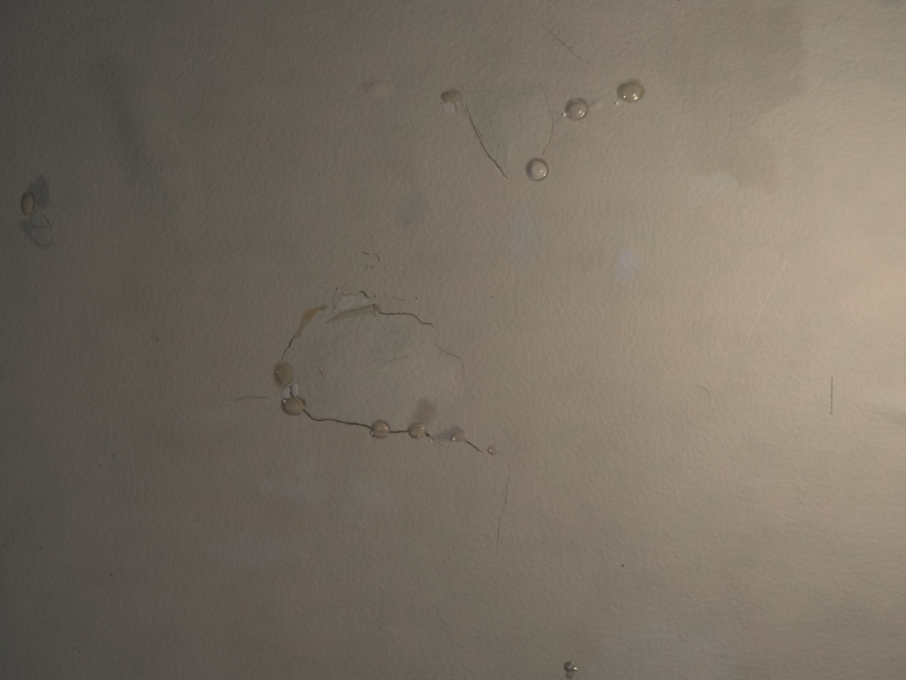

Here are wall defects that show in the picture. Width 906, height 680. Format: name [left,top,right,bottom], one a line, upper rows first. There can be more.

crack [465,103,509,182]
crack [321,286,465,382]
crack [281,320,483,453]